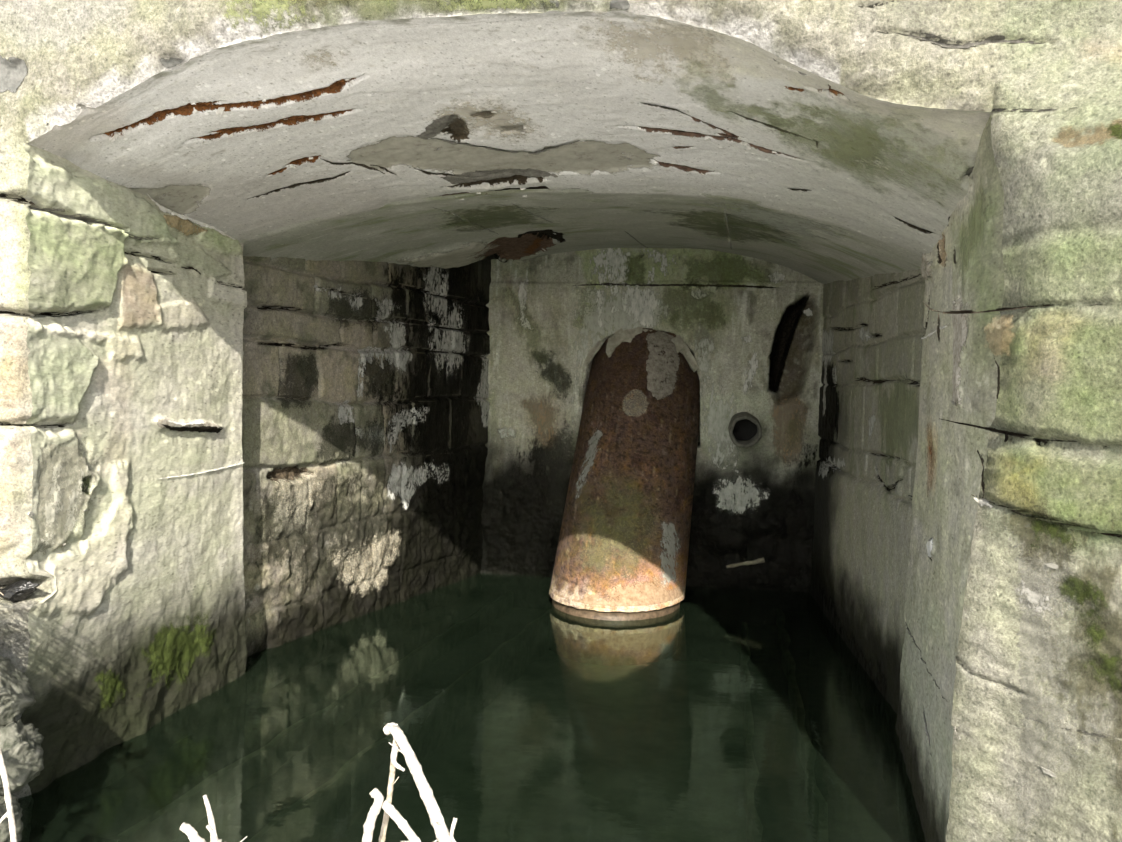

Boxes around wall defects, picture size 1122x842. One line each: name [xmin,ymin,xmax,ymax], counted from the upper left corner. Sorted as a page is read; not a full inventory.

crack [859,1,1043,48]
crack [249,155,452,199]
flaking render [347,111,660,200]
crack [638,103,818,176]
flaking render [467,229,565,261]
damp [517,279,531,330]
damp [255,265,490,586]
damp [481,421,603,584]
corrosion [550,577,683,607]
crack [905,622,961,757]